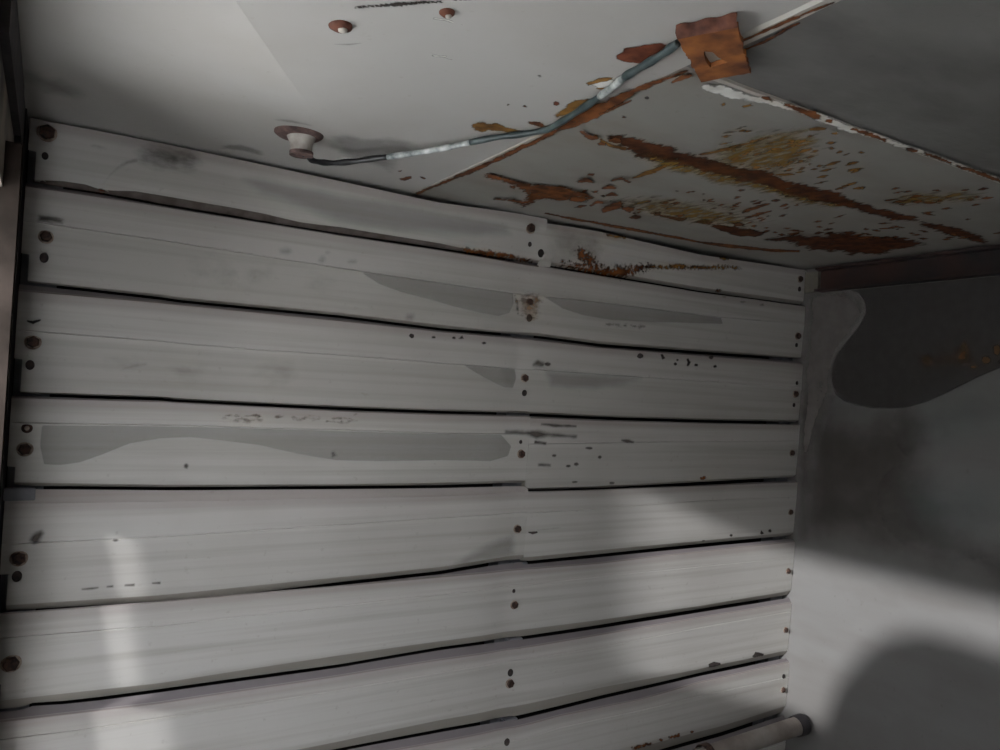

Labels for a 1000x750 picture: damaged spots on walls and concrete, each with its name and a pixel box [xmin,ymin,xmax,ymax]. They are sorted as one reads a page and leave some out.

rust [399,70,1000,279]
peeling [702,85,802,114]
peeling [815,113,1000,180]
water stain [831,276,1000,408]